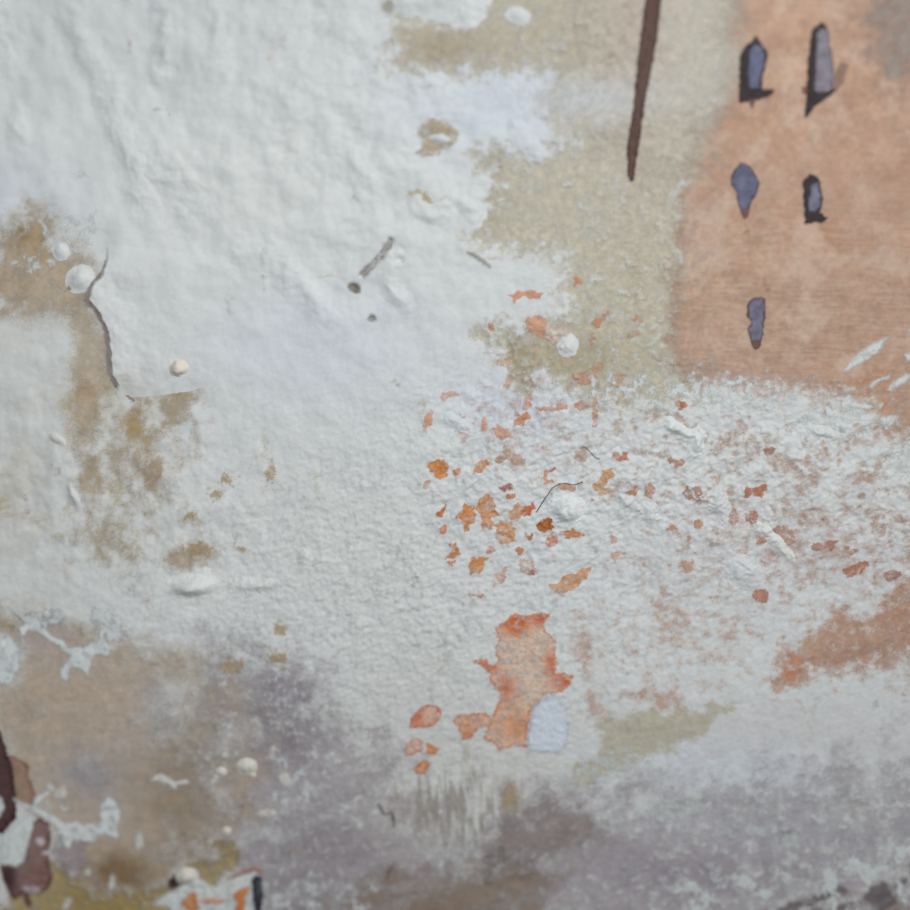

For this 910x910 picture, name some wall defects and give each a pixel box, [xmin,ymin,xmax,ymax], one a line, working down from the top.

crack [68,261,134,401]
peeling [154,867,264,910]